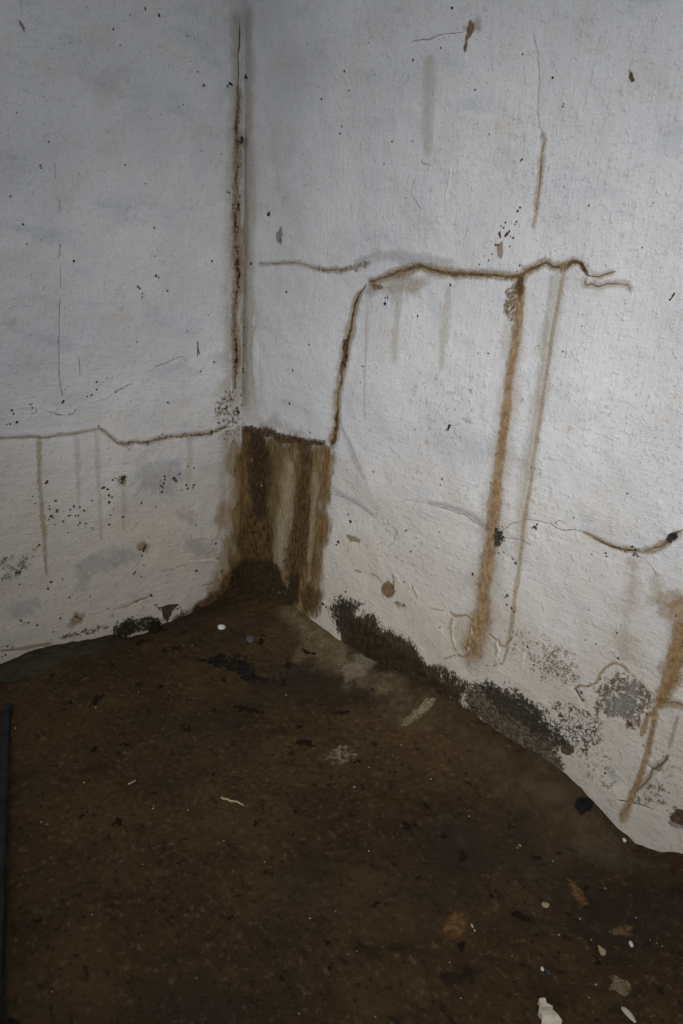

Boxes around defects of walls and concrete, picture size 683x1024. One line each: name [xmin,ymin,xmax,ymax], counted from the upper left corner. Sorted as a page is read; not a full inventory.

crack [232,22,631,445]
rust [478,206,521,265]
crack [0,426,228,568]
leakage [107,443,242,637]
rust [465,265,524,660]
crack [505,519,683,574]
leakage [327,594,602,771]
rust [619,594,683,822]